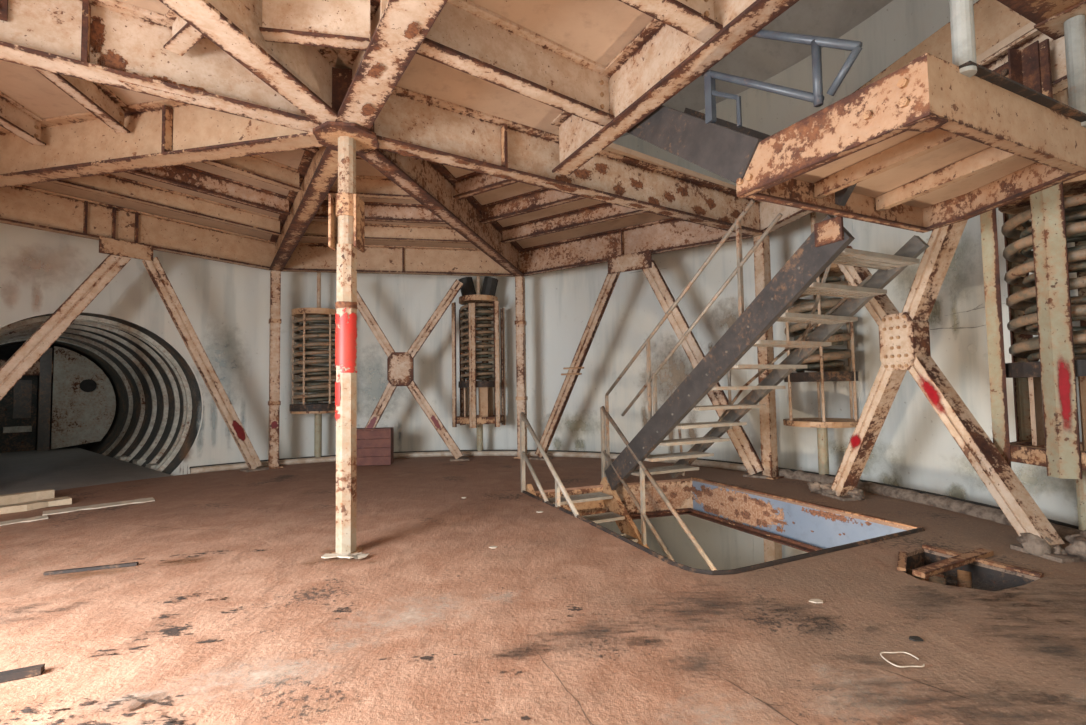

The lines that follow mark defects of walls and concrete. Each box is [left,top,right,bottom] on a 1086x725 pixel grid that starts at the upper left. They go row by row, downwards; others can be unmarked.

rust [403,21,422,39]
rust [365,62,386,79]
rust [361,103,377,116]
peeling [622,484,795,533]
peeling [801,507,872,536]
crack [532,646,594,725]